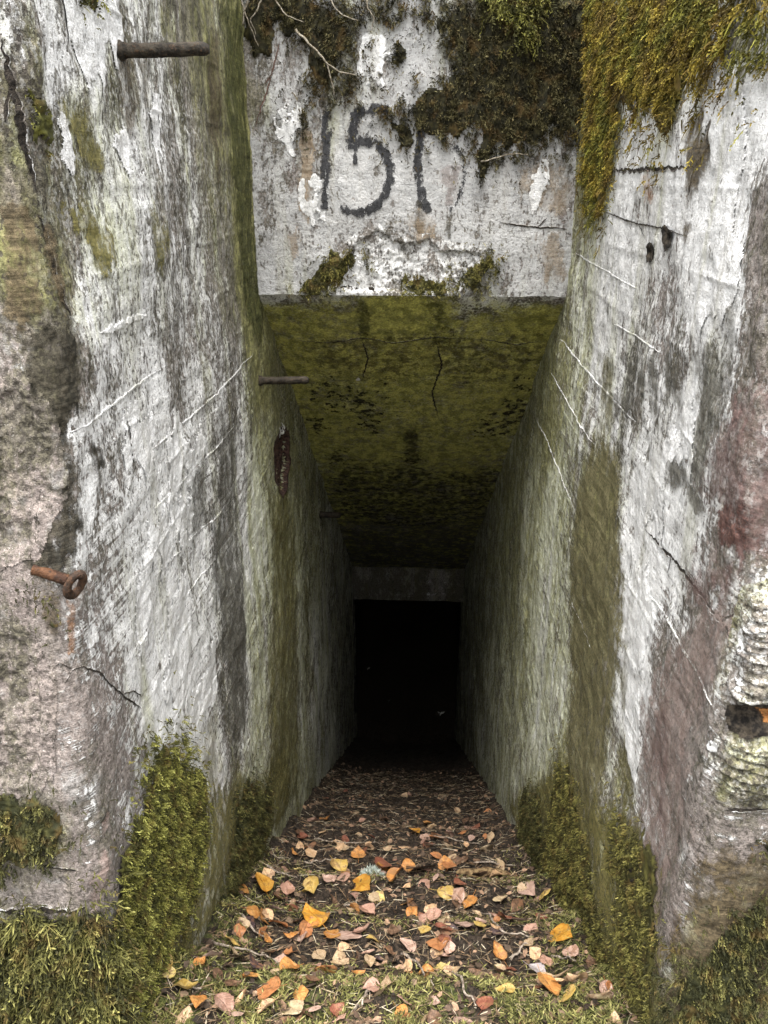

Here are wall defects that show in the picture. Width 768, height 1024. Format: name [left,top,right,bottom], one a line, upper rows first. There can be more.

corrosion [117,39,210,135]
peeling [357,33,391,87]
peeling [273,100,302,157]
crack [0,39,72,319]
peeling [298,173,325,227]
peeling [529,159,550,215]
crack [608,213,687,237]
crack [613,165,693,195]
corrosion [258,375,309,386]
crack [645,529,734,636]
crack [55,663,141,708]
spalling [725,704,768,740]